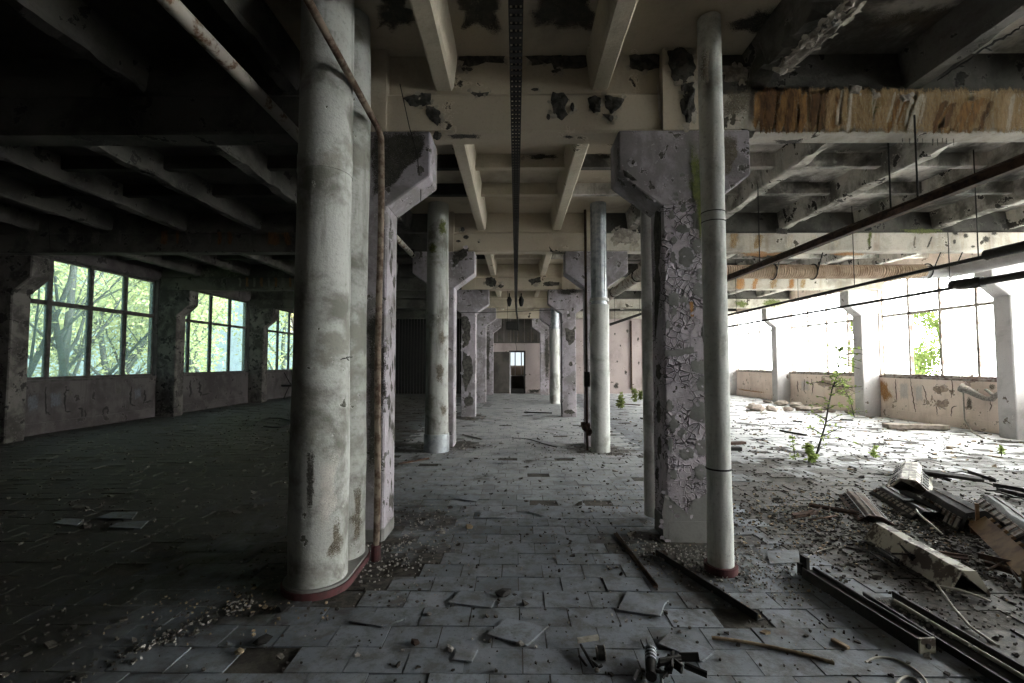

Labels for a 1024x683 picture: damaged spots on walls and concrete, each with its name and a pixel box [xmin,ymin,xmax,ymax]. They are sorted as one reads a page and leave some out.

spalling [404,91,481,140]
peeling [457,56,507,74]
peeling [525,55,588,77]
spalling [531,87,627,125]
spalling [624,47,748,133]
spalling [772,0,867,76]
peeling [460,316,473,406]
water stain [306,448,340,540]